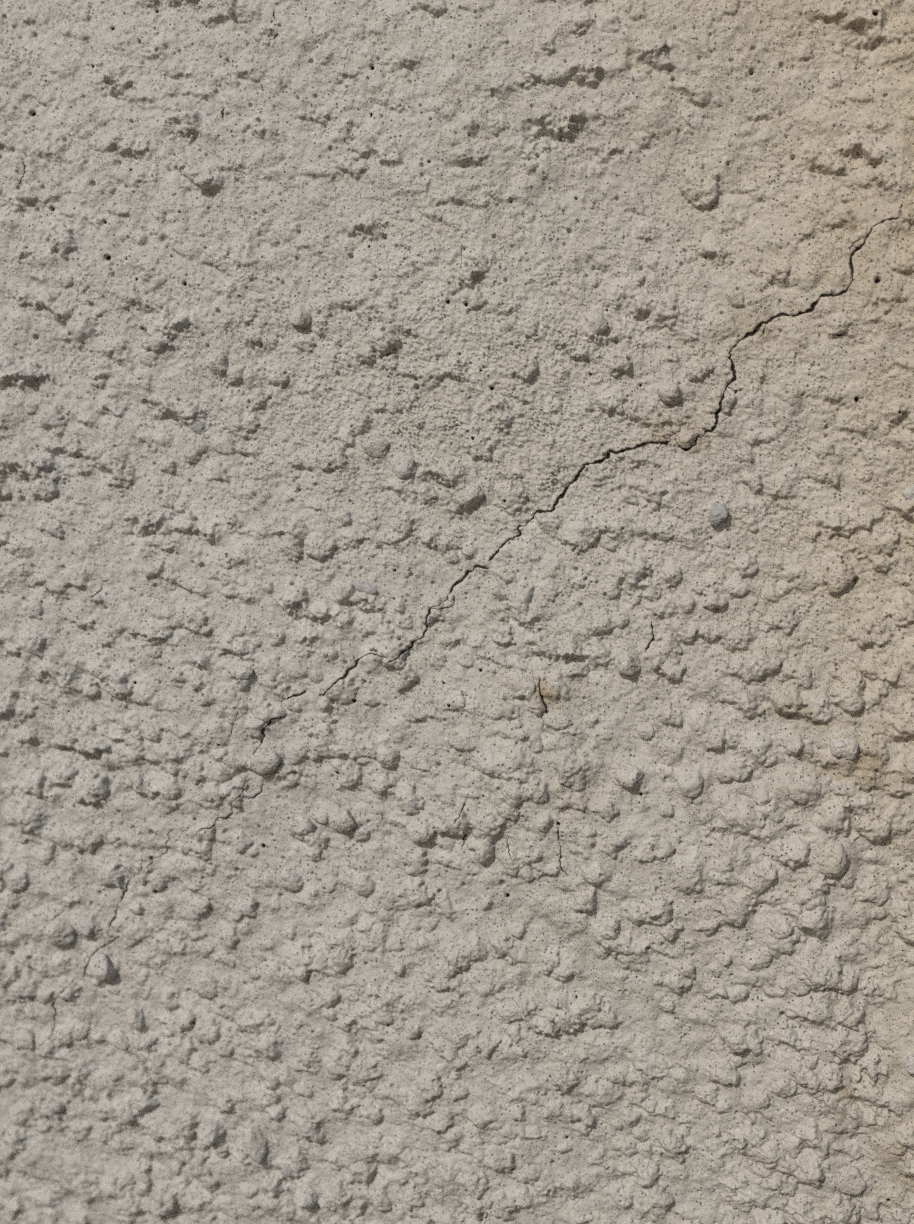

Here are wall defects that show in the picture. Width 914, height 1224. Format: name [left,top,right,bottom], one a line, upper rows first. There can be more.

crack [39,202,903,1046]